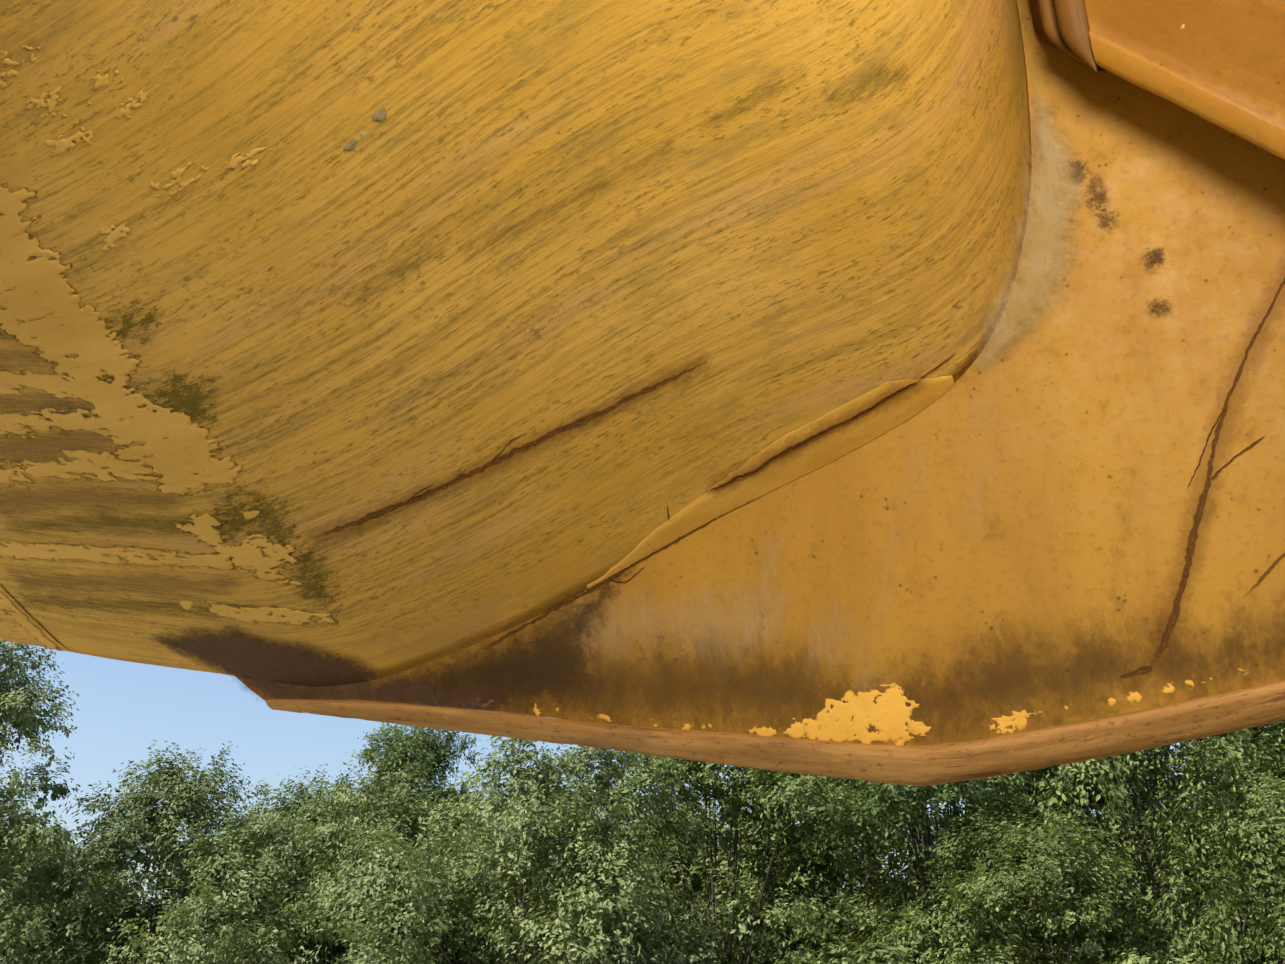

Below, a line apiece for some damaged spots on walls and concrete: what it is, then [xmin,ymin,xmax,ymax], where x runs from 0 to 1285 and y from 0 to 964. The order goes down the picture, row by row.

peeling [0,184,242,495]
damp [0,432,113,462]
damp [0,485,195,536]
peeling [0,509,302,585]
crack [320,365,699,535]
crack [485,354,954,648]
crack [1120,278,1285,678]
peeling [179,600,337,625]
damp [11,571,848,727]
peeling [740,682,932,745]
peeling [988,709,1043,734]
damp [903,643,1141,728]